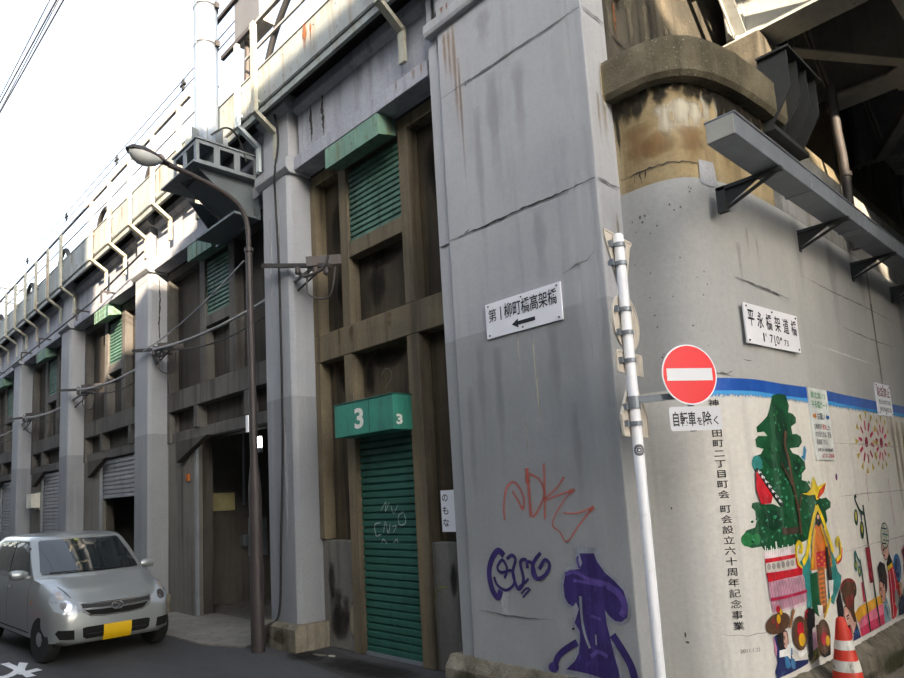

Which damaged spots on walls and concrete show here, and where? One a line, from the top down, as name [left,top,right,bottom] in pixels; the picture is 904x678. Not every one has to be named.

crack [441,7,626,99]
leakage [611,83,770,138]
crack [441,160,694,248]
leakage [329,566,348,637]